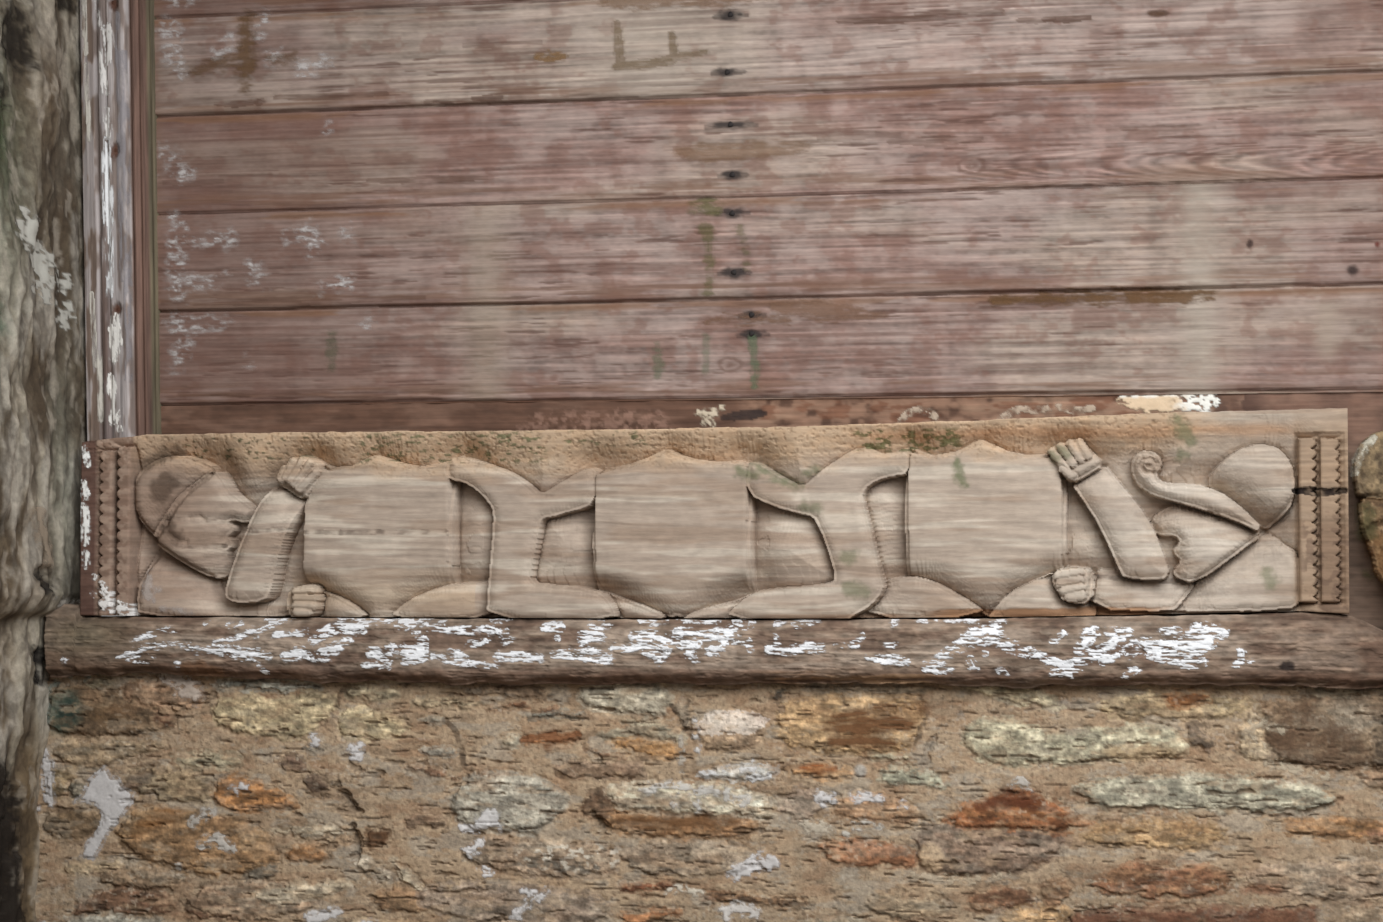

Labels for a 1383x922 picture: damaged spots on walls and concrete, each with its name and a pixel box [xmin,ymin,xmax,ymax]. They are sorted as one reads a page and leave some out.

peeling [81,446,1254,679]